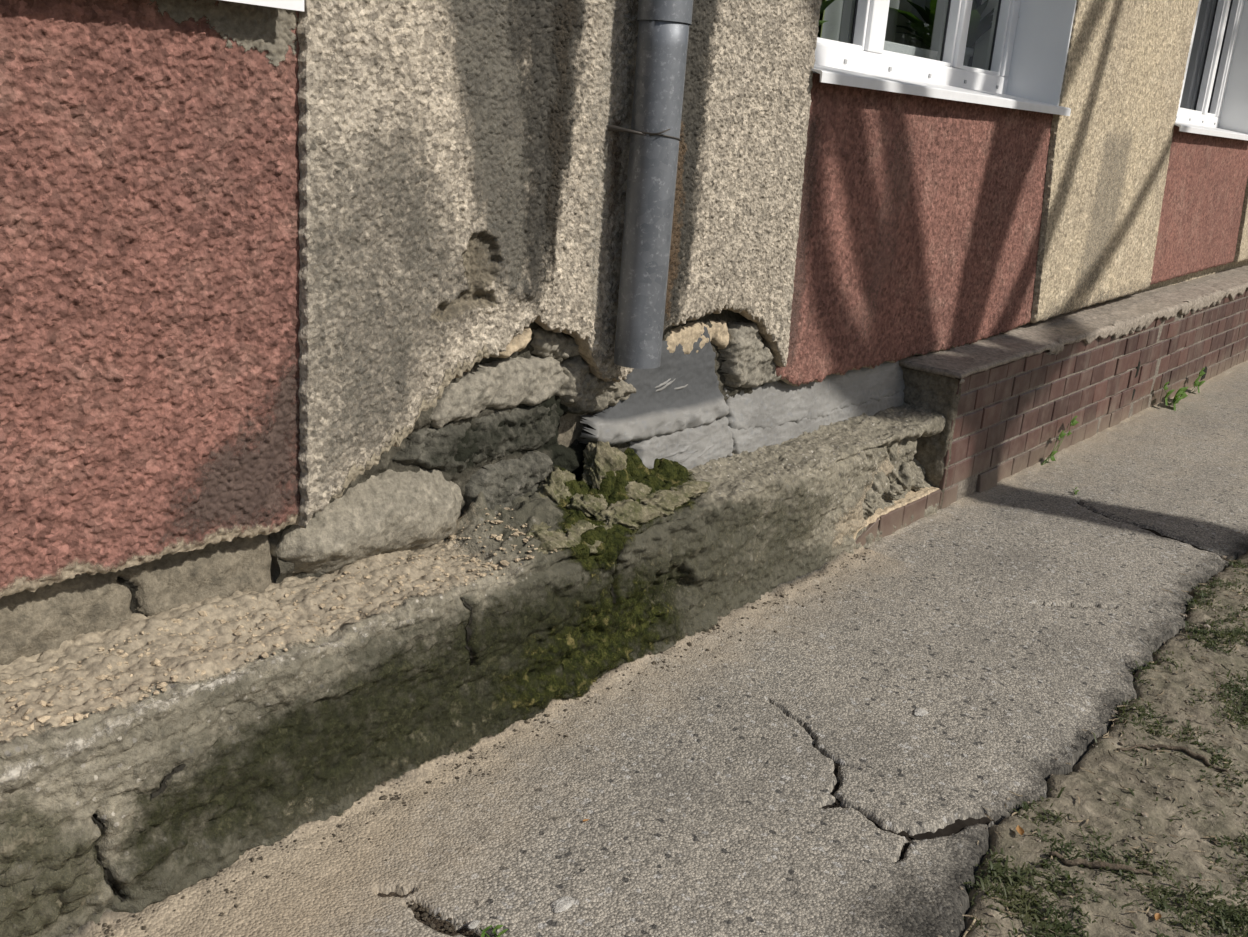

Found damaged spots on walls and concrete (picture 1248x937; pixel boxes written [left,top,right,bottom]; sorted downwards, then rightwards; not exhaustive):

flaking render [147,0,298,67]
damp [444,0,586,308]
damp [663,0,720,332]
flaking render [431,230,502,322]
flaking render [662,309,781,417]
flaking render [0,321,710,599]
crack [117,577,147,617]
crack [810,736,996,863]
crack [92,814,126,901]
crack [378,891,477,937]